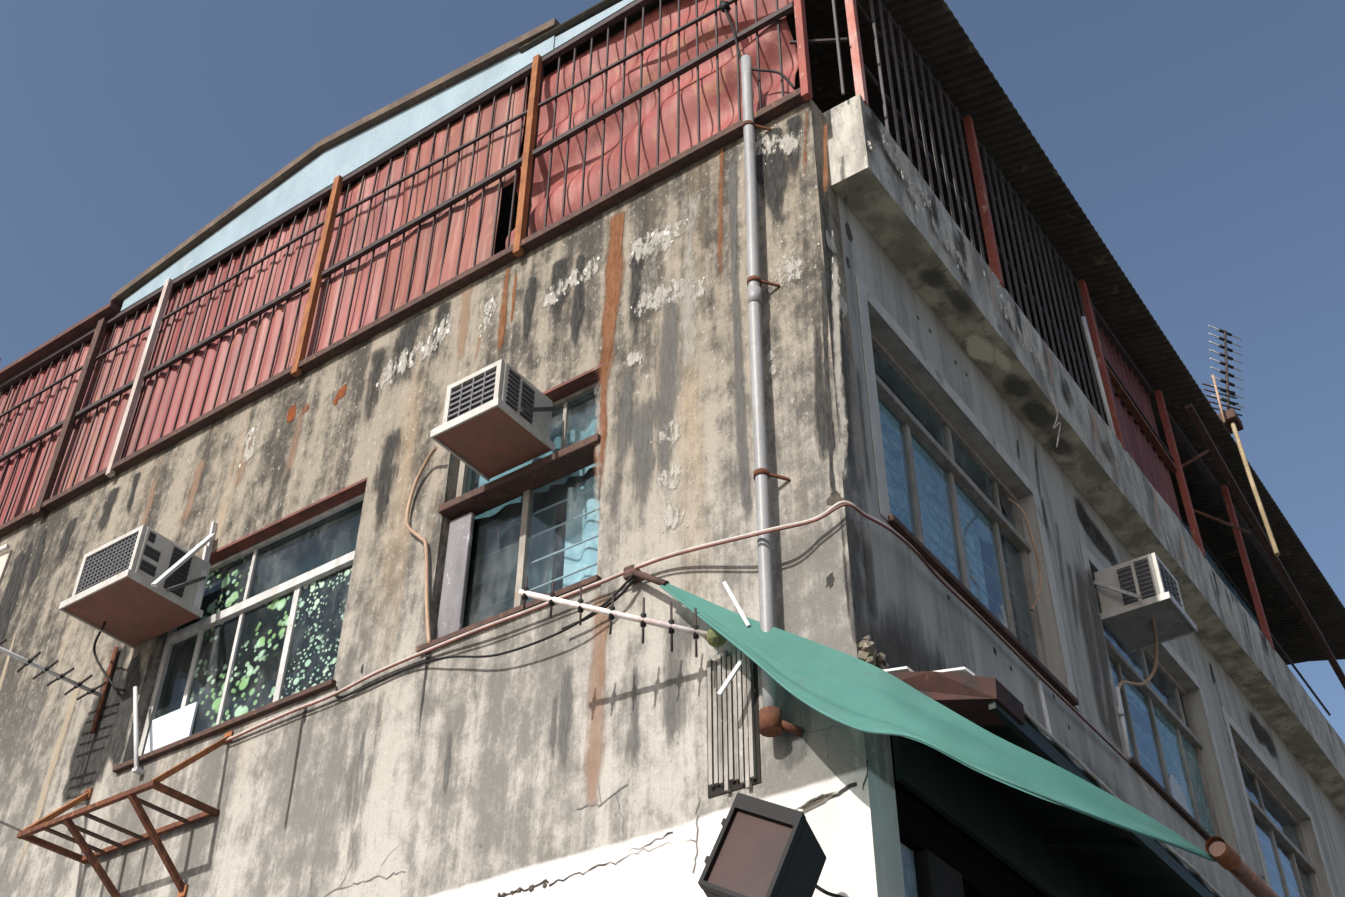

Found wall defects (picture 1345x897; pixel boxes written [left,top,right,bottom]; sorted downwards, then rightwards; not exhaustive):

peeling [376,313,452,390]
damp [523,255,585,347]
rust [595,212,625,495]
damp [618,196,700,500]
peeling [629,219,690,264]
peeling [631,277,708,317]
damp [755,115,801,221]
damp [814,262,870,495]
damp [841,521,943,672]
damp [32,645,141,824]
rust [587,596,608,801]
crack [499,779,700,897]